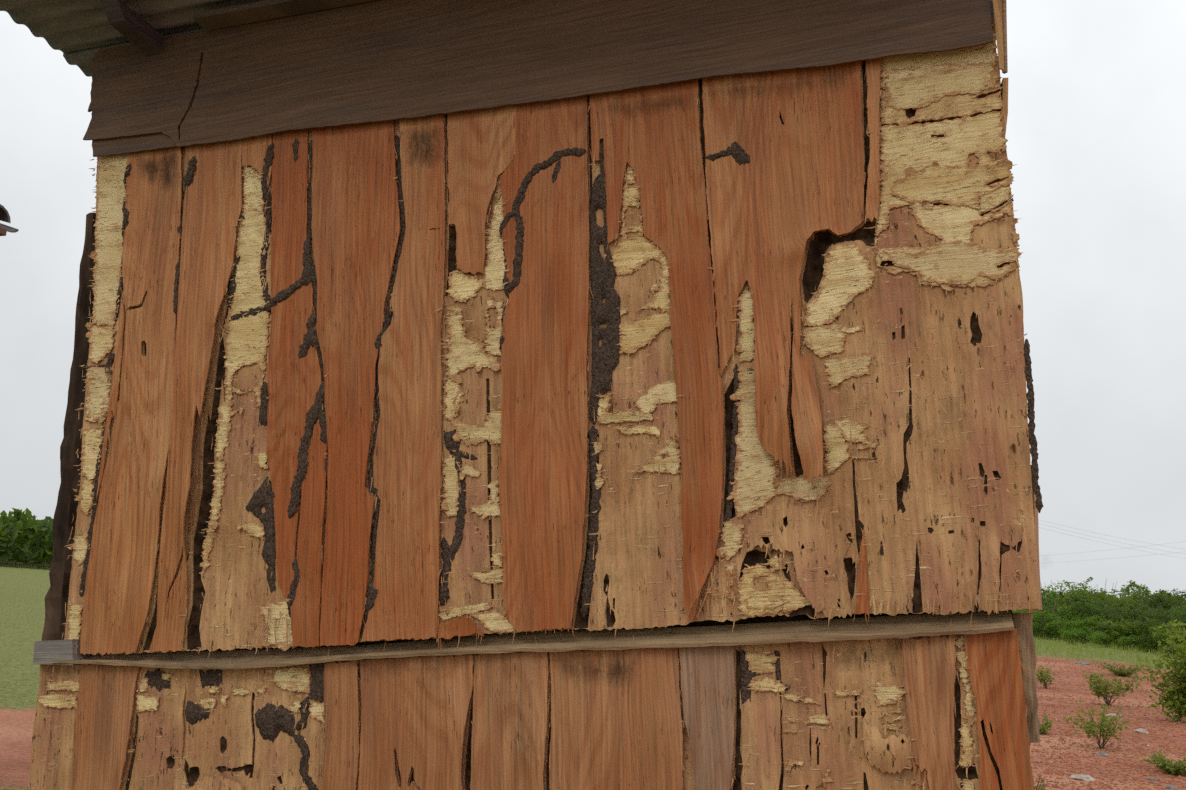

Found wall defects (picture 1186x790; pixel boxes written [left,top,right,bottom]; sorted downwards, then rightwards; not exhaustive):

peeling [64,529,90,570]
peeling [73,153,129,515]
peeling [189,164,271,577]
peeling [195,667,325,737]
peeling [434,180,509,534]
peeling [438,599,515,633]
peeling [591,374,683,494]
peeling [604,163,672,368]
peeling [706,286,886,617]
peeling [745,651,917,788]
peeling [791,20,1023,401]
peeling [955,635,980,790]